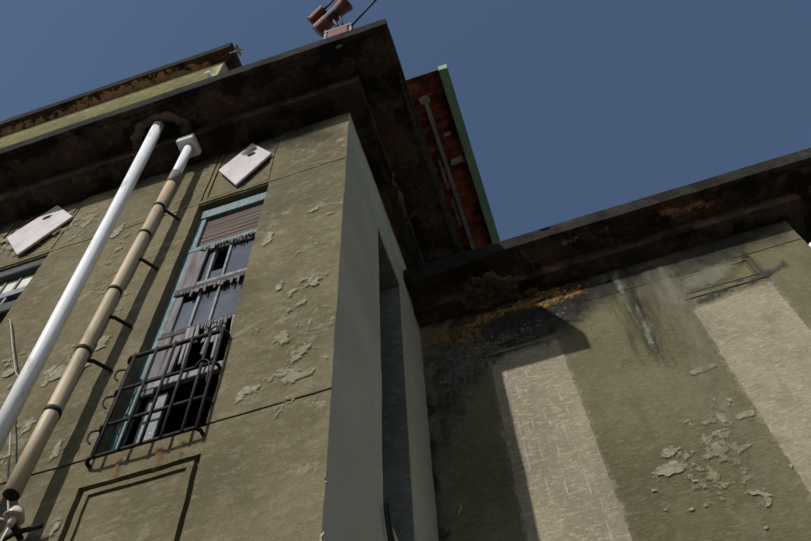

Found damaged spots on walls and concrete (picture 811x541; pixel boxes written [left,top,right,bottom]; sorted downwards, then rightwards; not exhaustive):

peeling [1,351,24,388]
peeling [235,265,328,404]
peeling [650,397,772,506]